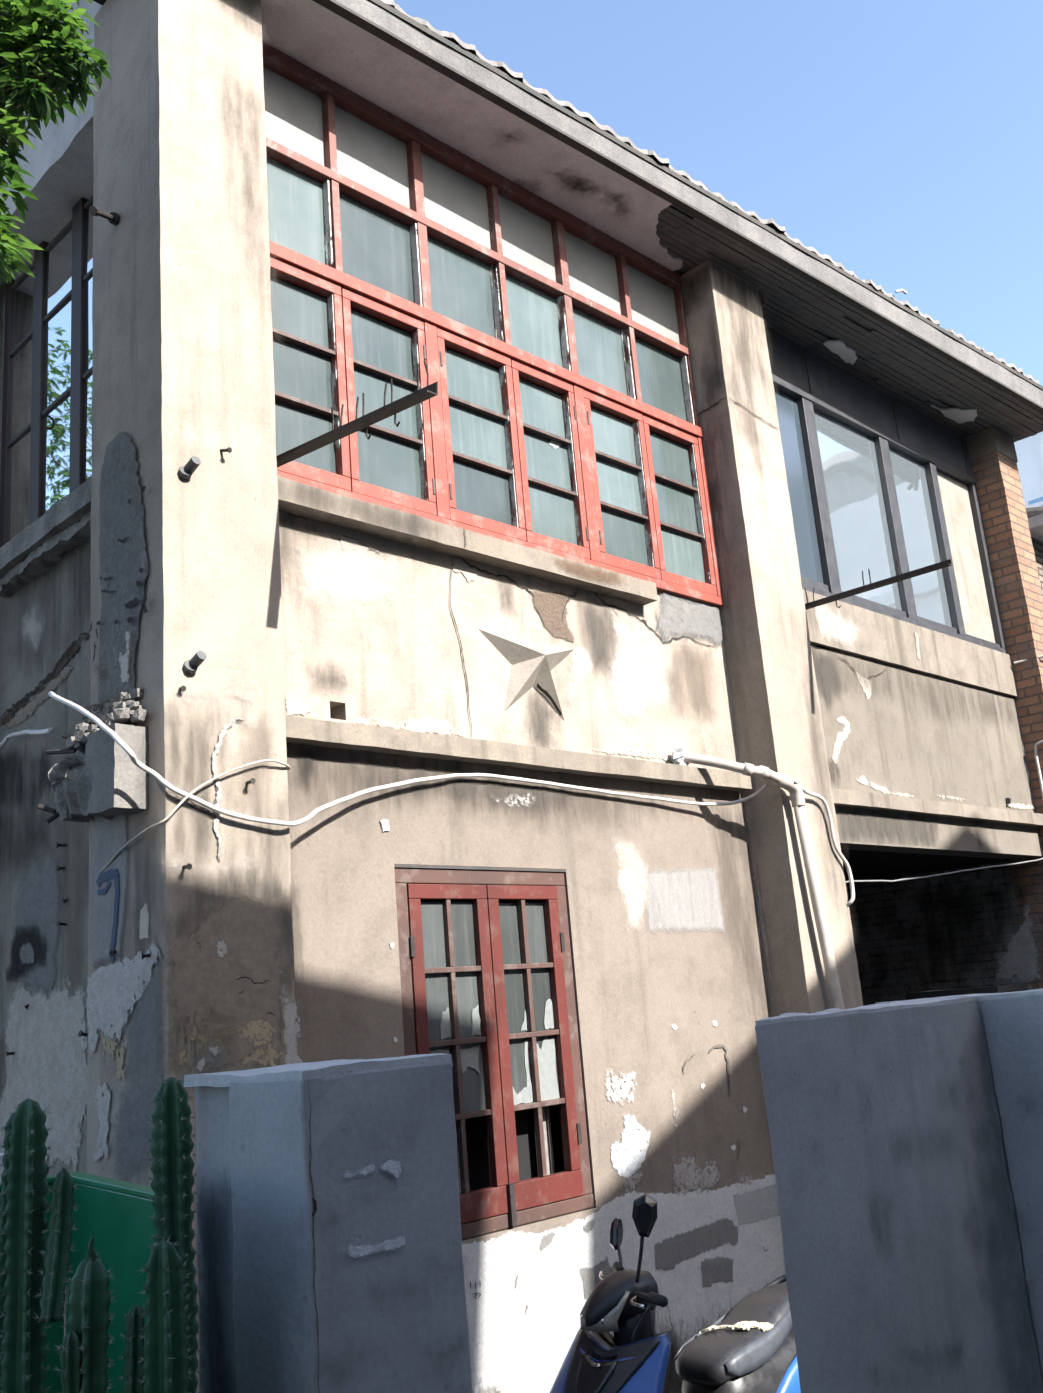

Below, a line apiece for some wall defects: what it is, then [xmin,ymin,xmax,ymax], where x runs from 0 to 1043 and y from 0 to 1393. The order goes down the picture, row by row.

damp [564,177,592,192]
crack [450,530,544,738]
crack [593,592,715,647]
peeling [3,666,72,728]
flaking render [832,716,850,764]
peeling [0,902,161,1172]
peeling [179,970,303,1071]
peeling [611,1095,651,1192]
peeling [671,1155,720,1194]
damp [663,1337,683,1393]